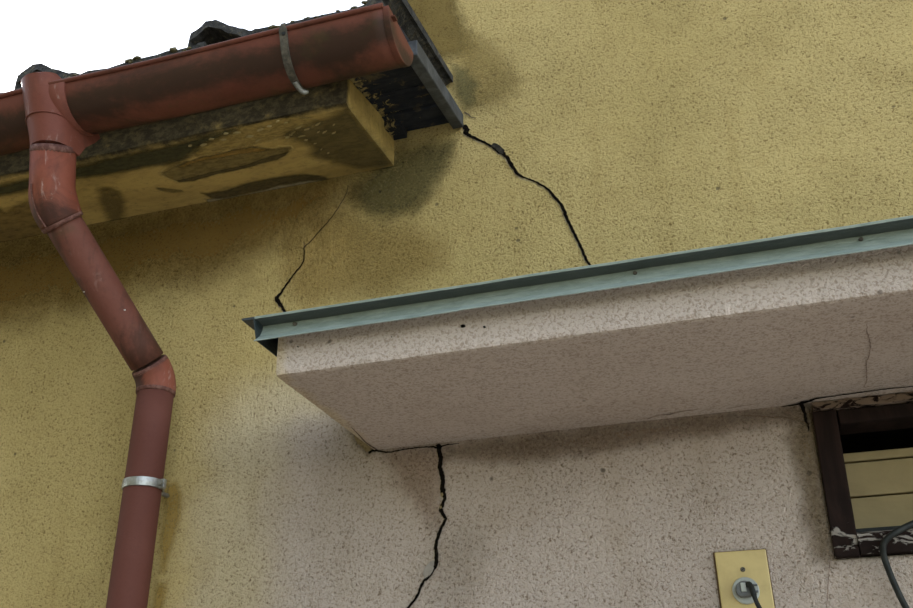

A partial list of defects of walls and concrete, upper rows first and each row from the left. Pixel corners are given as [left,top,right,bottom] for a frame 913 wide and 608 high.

water stain [0,201,47,242]
water stain [101,188,124,221]
crack [275,186,349,312]
crack [459,112,593,266]
crack [351,427,459,608]